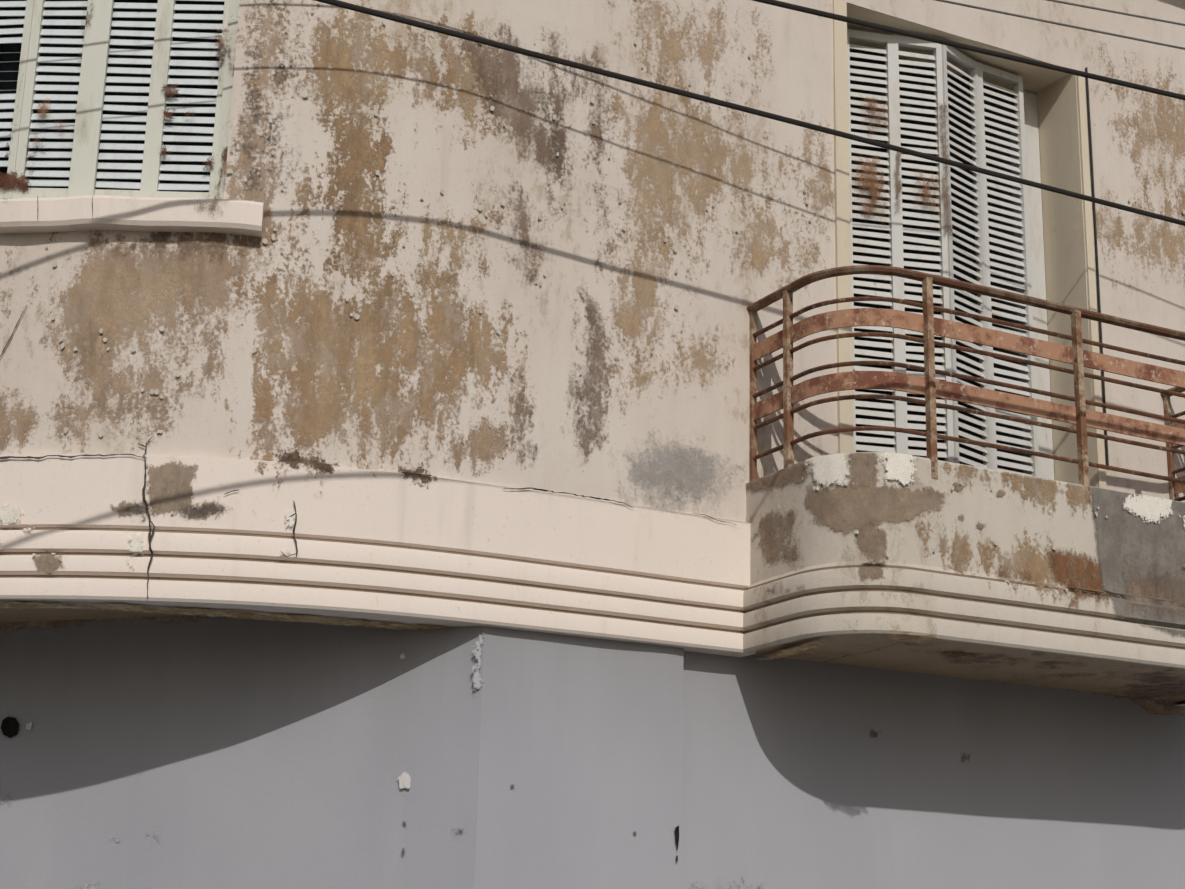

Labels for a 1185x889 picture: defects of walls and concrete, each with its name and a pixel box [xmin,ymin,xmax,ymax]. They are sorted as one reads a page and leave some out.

peeling [1092,57,1185,278]
peeling [0,0,835,493]
peeling [0,501,36,552]
crack [0,437,155,599]
peeling [111,461,223,519]
water stain [181,503,223,519]
peeling [746,452,1122,603]
peeling [1123,493,1185,529]
water stain [1090,487,1185,637]
spalling [0,601,454,631]
spalling [881,634,942,643]
peeling [397,772,411,789]